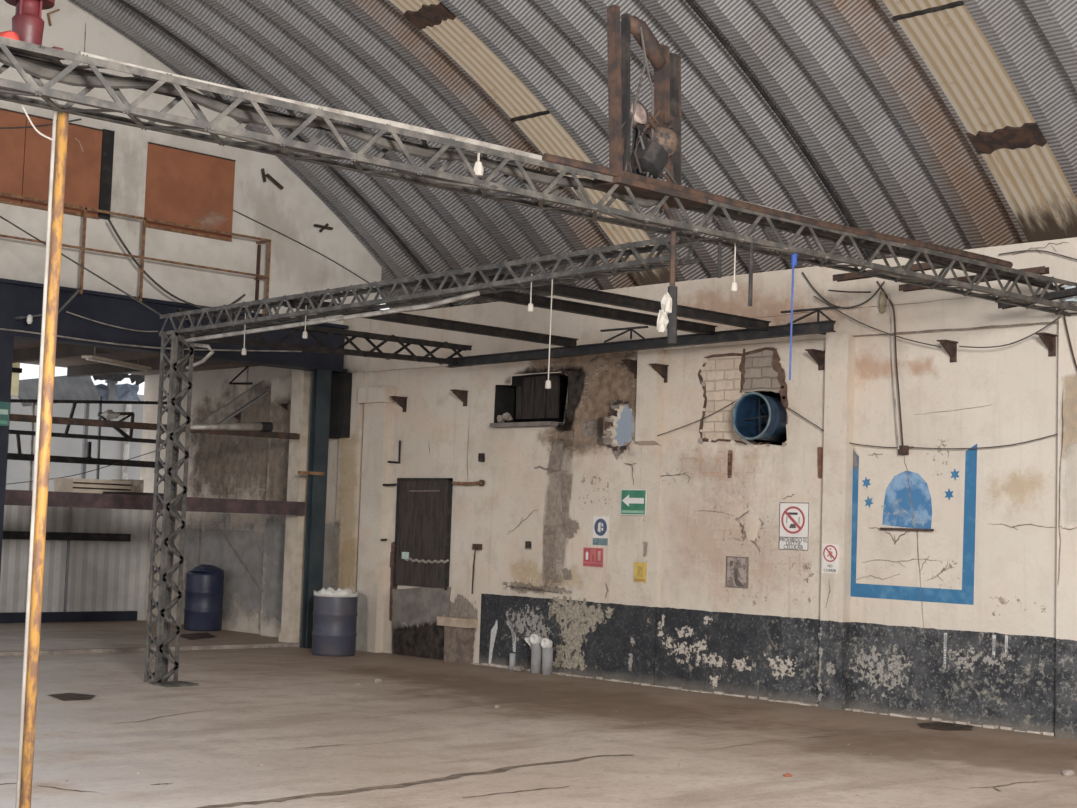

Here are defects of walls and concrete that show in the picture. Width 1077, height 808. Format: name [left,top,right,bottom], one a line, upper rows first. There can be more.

leakage [191,391,291,501]
leakage [530,350,638,585]
spalling [581,400,633,459]
spalling [697,347,789,445]
spalling [563,518,579,538]
leakage [184,513,286,622]
peeling [503,568,614,673]
peeling [657,614,797,688]
peeling [817,627,835,702]
peeling [849,637,922,698]
peeling [947,645,1014,674]
crack [197,754,626,808]